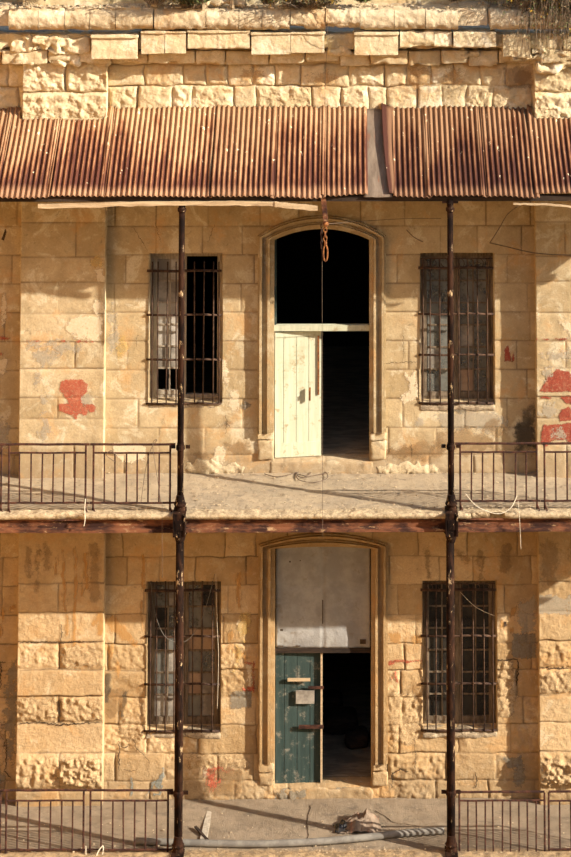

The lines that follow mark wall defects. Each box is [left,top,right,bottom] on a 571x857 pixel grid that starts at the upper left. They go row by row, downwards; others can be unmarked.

peeling [28,300,129,440]
peeling [222,359,251,412]
peeling [536,321,571,447]
damp [515,405,536,450]
spalling [186,446,245,474]
crack [498,658,571,686]